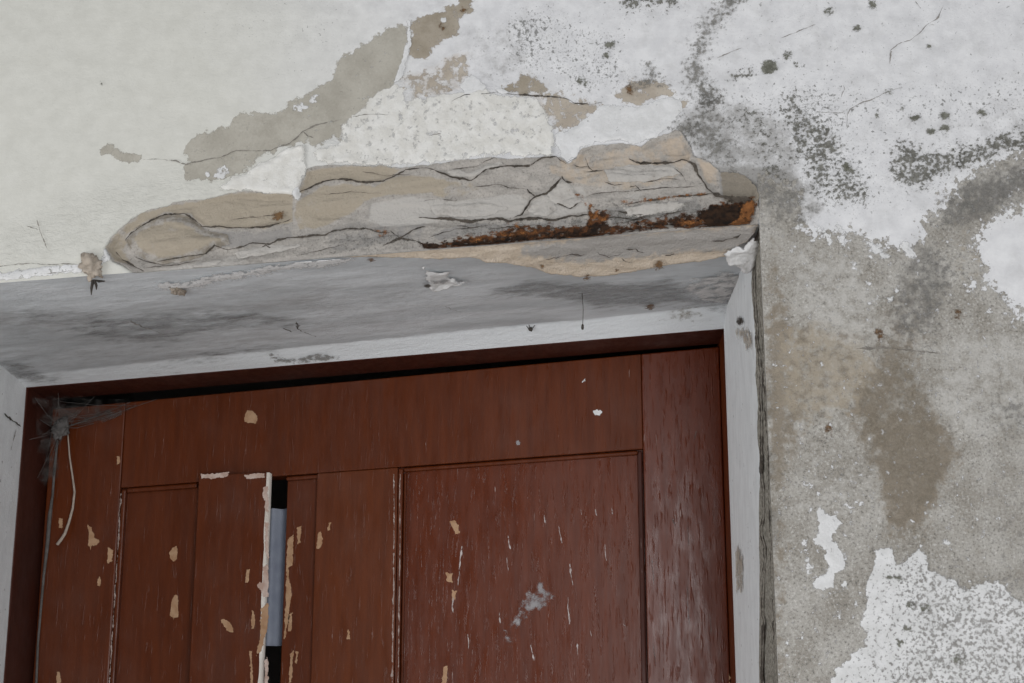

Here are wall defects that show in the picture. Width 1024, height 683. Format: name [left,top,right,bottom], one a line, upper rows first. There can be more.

peeling [0,264,82,281]
peeling [158,258,352,290]
crack [147,114,384,165]
flaking render [100,0,760,277]
crack [116,156,752,271]
peeling [422,266,465,292]
rust [421,193,758,249]
damp [630,0,875,222]
damp [888,104,1024,230]
peeling [757,146,1024,683]